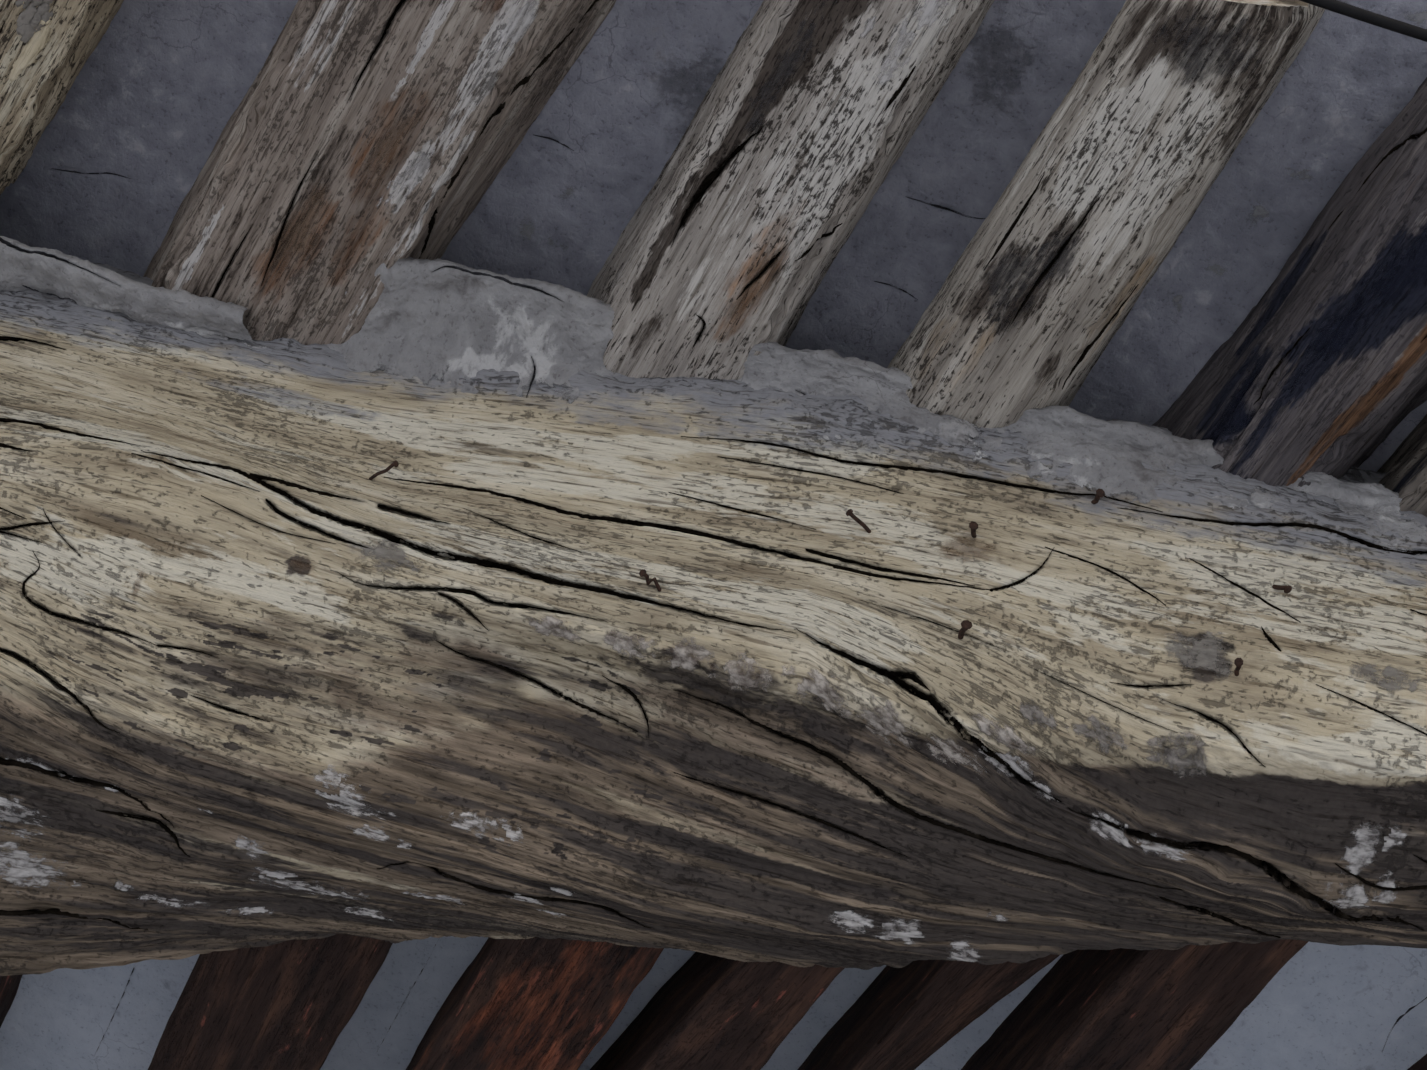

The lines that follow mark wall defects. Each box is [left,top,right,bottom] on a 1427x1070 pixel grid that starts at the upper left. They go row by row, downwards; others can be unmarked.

crack [0,418,1427,938]